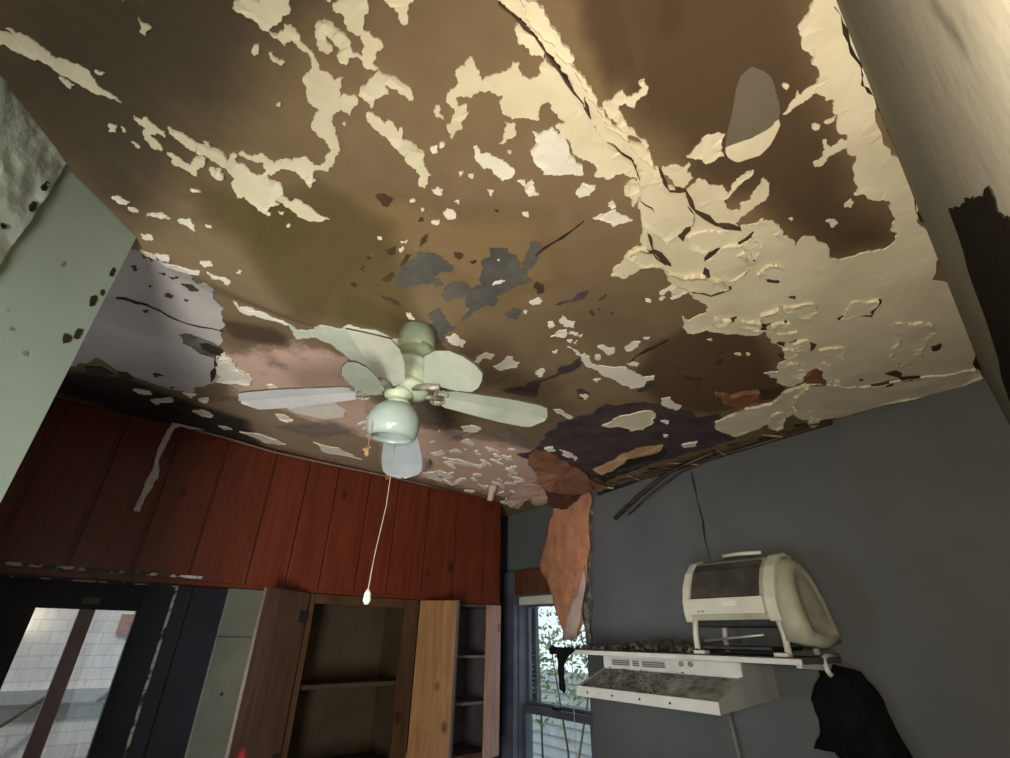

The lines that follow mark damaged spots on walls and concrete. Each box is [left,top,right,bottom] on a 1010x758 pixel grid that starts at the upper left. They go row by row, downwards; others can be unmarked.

peeling [0,27,121,103]
crack [498,1,591,119]
damp [619,0,875,245]
crack [115,297,223,332]
crack [210,357,219,382]
damp [211,195,554,329]
peeling [63,0,982,504]
crack [536,221,584,256]
crack [615,146,741,266]
crack [692,286,732,297]
spalling [948,185,1010,401]
crack [691,471,711,562]